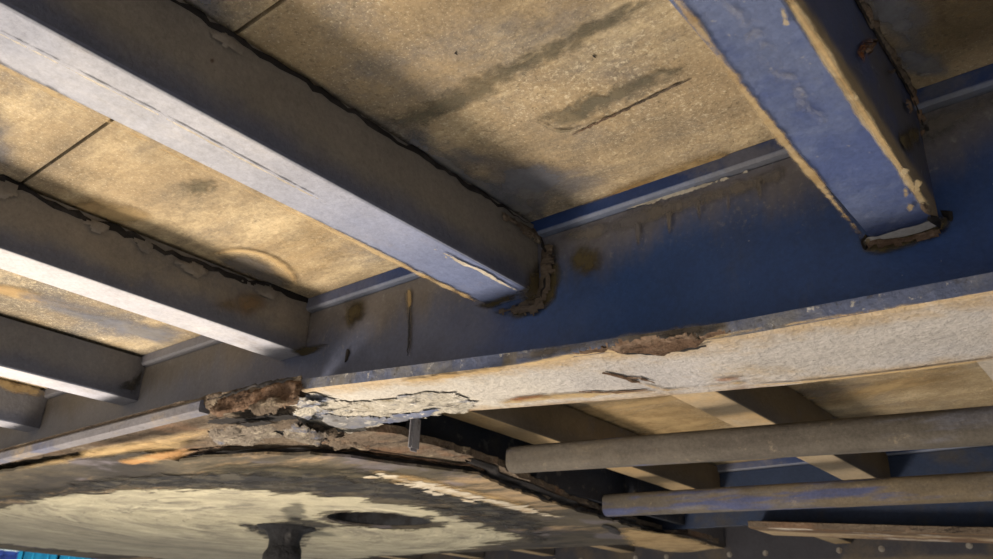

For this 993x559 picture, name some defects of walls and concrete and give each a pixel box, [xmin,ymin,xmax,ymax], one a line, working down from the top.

crack [572,78,691,135]
corrosion [675,0,953,253]
corrosion [609,155,725,196]
corrosion [162,149,559,317]
spalling [207,392,479,451]